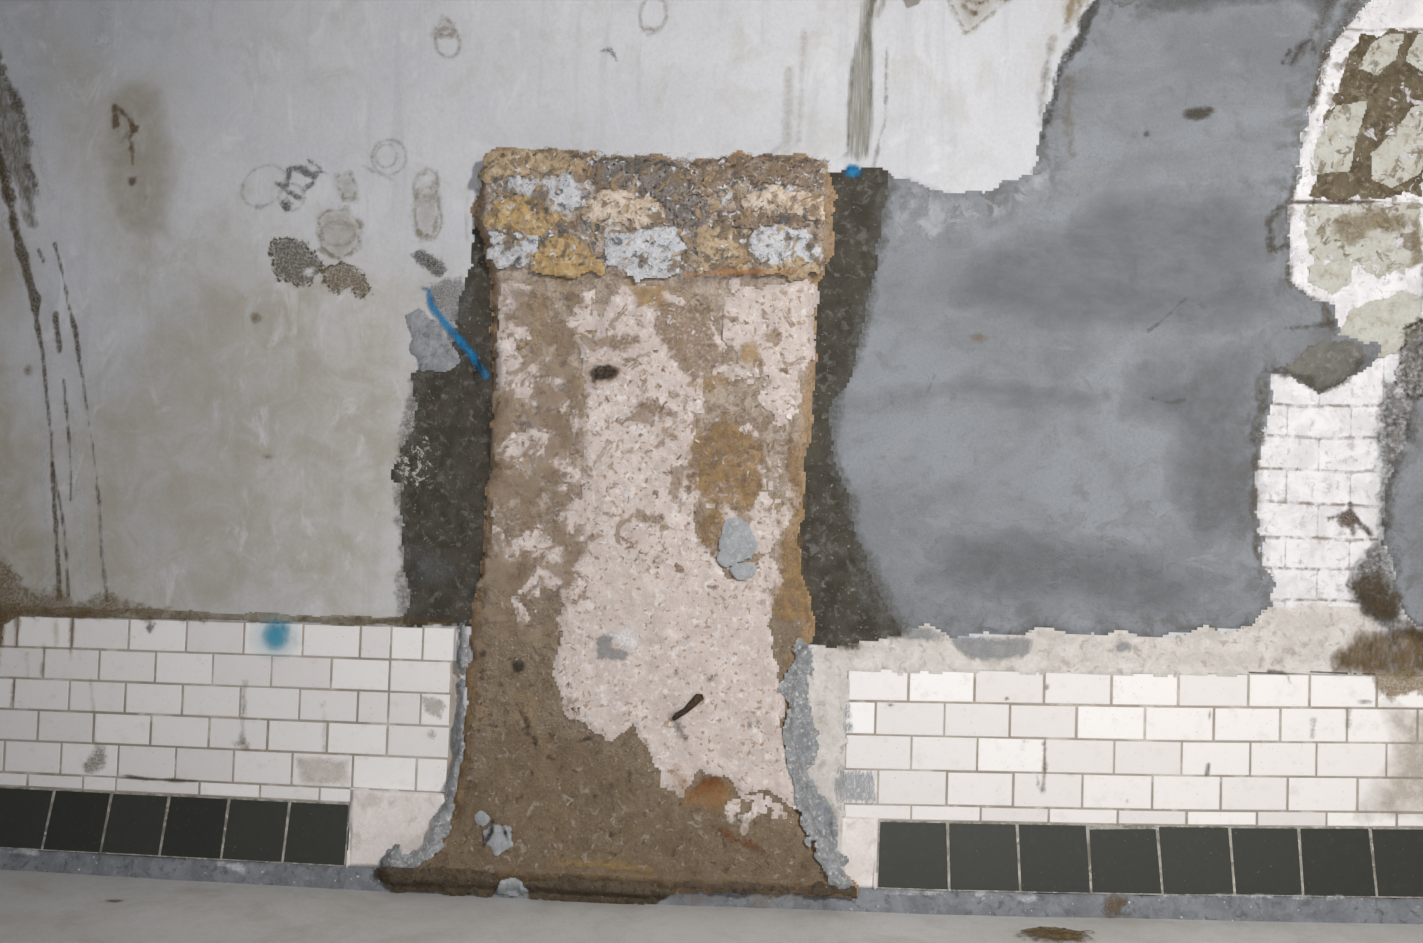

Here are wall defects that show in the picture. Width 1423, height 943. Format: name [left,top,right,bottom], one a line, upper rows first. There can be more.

damp [0,56,47,234]
damp [113,104,139,185]
damp [1185,108,1212,120]
spalling [414,251,469,321]
damp [797,0,905,648]
peeling [394,411,431,486]
peeling [491,281,602,631]
peeling [693,357,802,554]
peeling [807,0,1423,854]
spalling [424,698,442,716]
peeling [725,793,787,835]